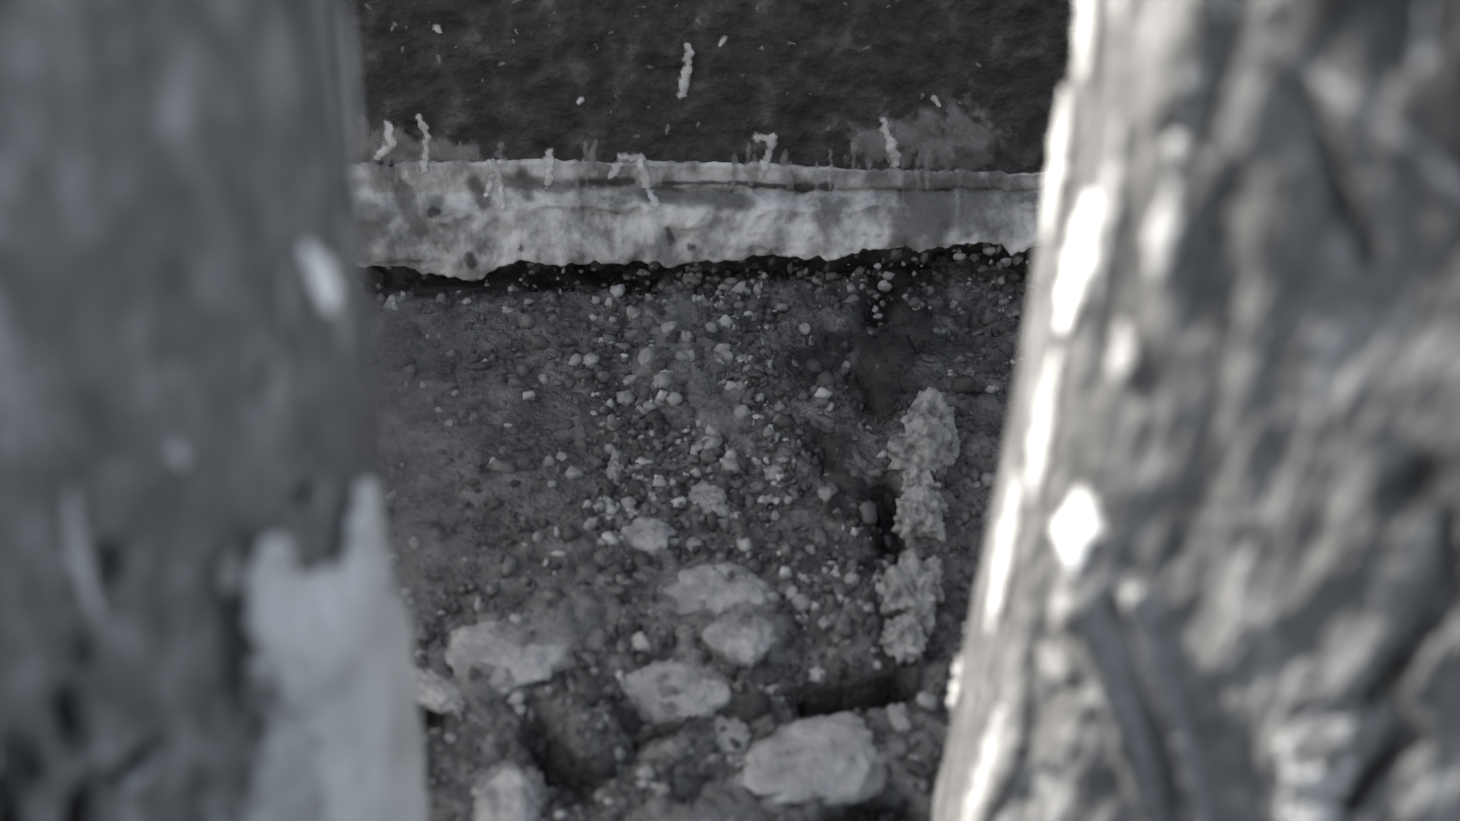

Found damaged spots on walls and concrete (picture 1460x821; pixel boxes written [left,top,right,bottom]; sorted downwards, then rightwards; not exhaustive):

water stain [677,43,694,99]
water stain [754,133,777,181]
water stain [353,114,753,388]
water stain [278,242,340,333]
water stain [421,710,437,725]
water stain [614,692,771,748]
water stain [528,724,617,793]